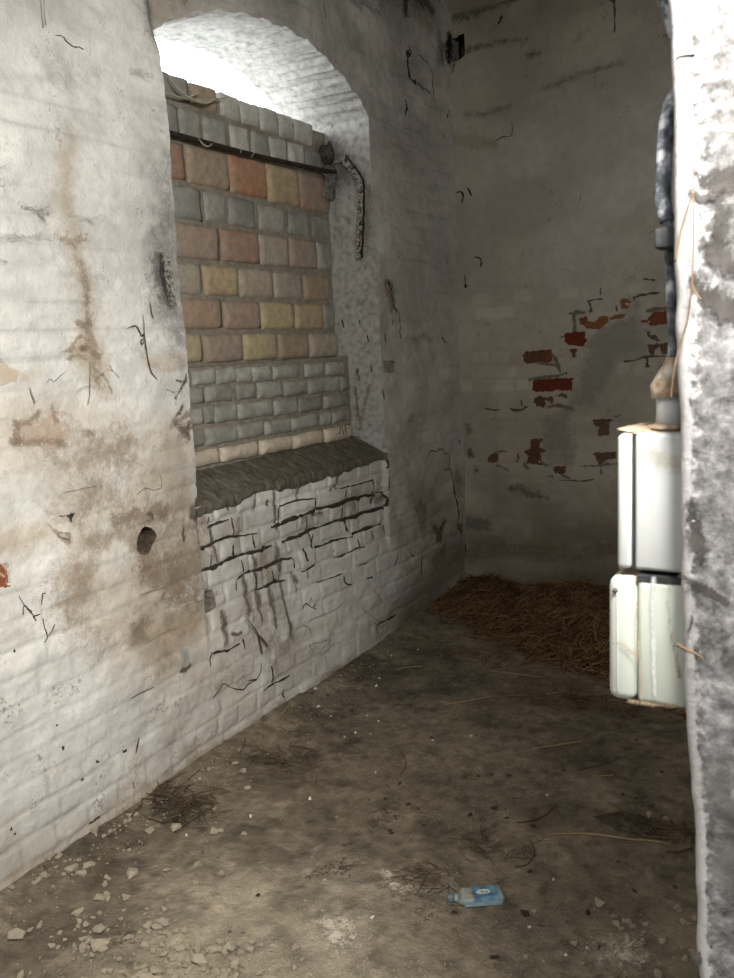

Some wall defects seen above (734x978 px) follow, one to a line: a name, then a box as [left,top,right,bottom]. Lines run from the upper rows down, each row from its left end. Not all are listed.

leakage [60,237,97,358]
spalling [560,298,631,357]
spalling [641,306,668,355]
leakage [10,407,68,449]
leakage [167,375,192,441]
spalling [522,349,574,410]
spalling [523,438,570,479]
spalling [583,452,617,474]
leakage [116,504,172,524]
leakage [182,506,218,563]
spalling [0,564,11,588]
crack [303,591,382,656]